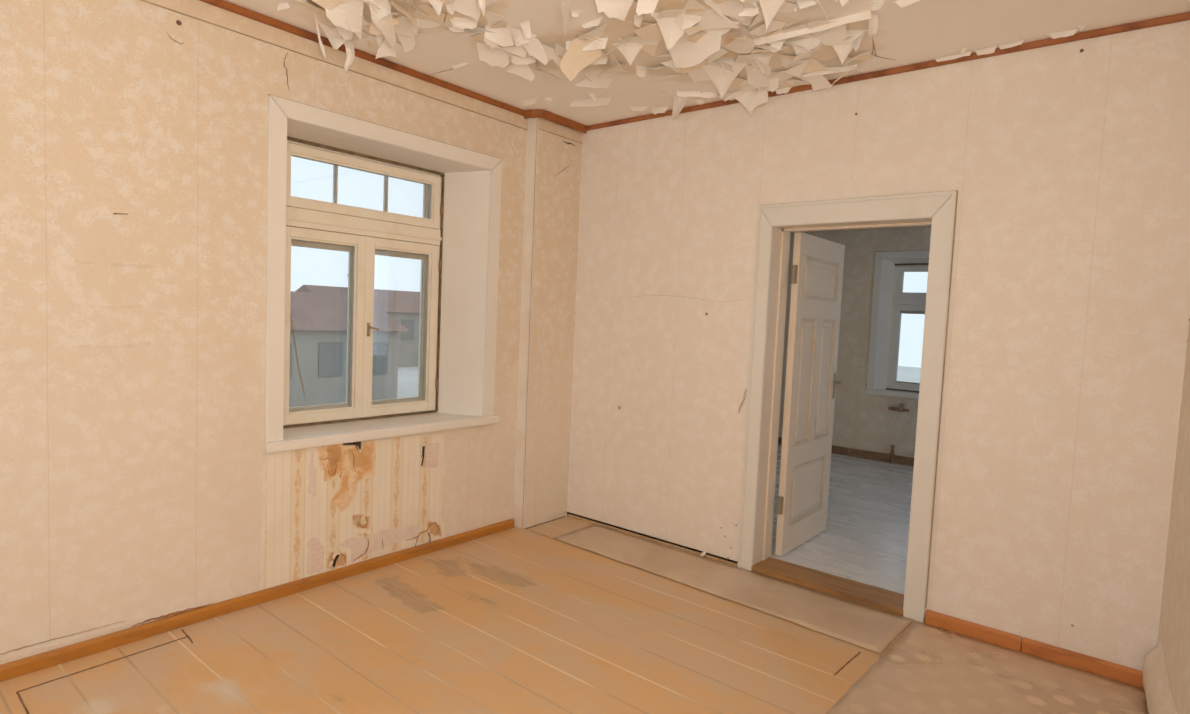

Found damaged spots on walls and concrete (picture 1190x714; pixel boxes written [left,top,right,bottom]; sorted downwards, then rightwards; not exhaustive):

peeling [1046,22,1091,39]
peeling [277,0,920,121]
peeling [934,36,1024,62]
spalling [340,441,364,452]
spalling [350,510,375,539]